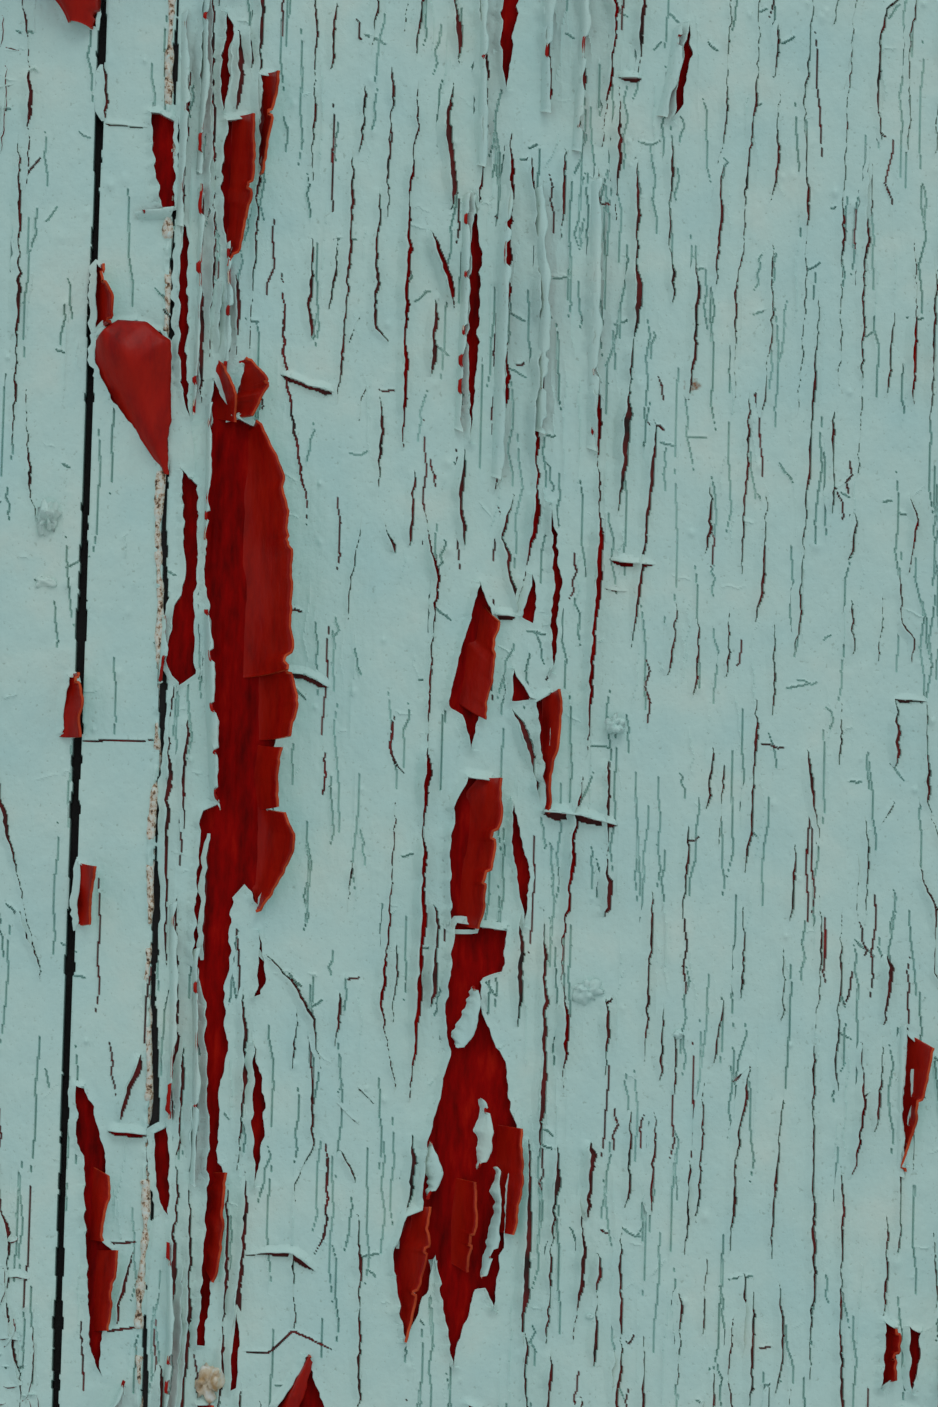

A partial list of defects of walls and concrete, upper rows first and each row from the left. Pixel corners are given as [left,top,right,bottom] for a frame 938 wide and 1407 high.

crack [0,0,36,522]
crack [175,0,265,402]
crack [0,1199,39,1407]
crack [0,799,41,982]
peeling [68,1080,119,1377]
peeling [87,0,299,1407]
crack [83,686,362,1407]
peeling [269,1354,328,1407]
peeling [387,772,535,1369]
peeling [441,500,566,818]
crack [280,0,938,1407]
peeling [895,1024,935,1178]